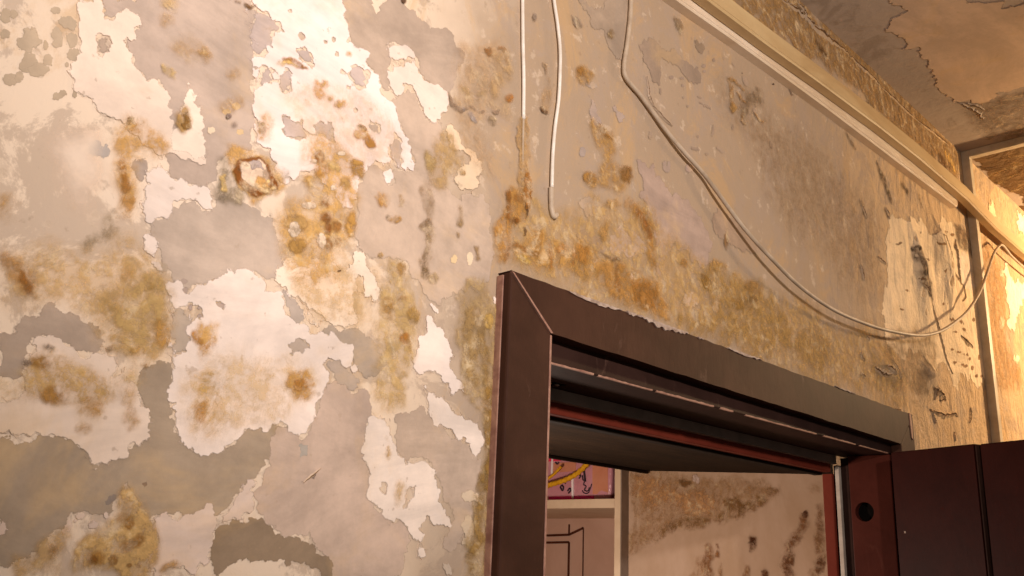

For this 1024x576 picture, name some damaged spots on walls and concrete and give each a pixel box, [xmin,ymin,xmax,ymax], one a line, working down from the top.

flaking render [639,37,748,110]
peeling [885,0,1024,105]
leakage [9,252,165,352]
flaking render [0,0,495,576]
leakage [513,198,935,406]
leakage [457,278,496,576]
leakage [629,472,775,549]